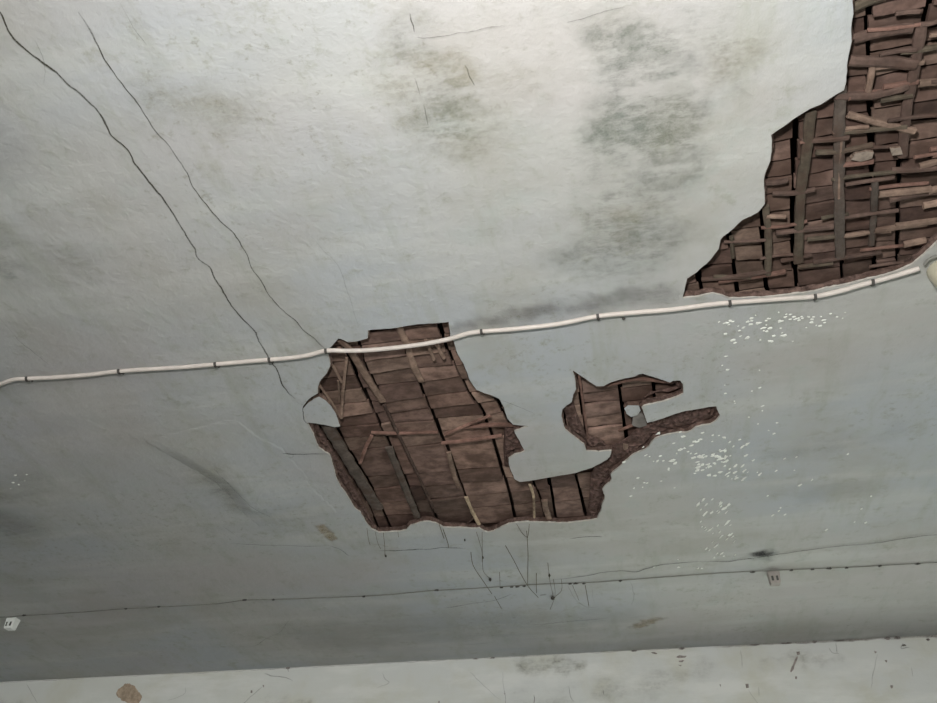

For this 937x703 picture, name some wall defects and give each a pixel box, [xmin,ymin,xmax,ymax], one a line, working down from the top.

crack [0,12,315,392]
damp [590,104,679,144]
spalling [683,0,937,299]
spalling [302,322,762,609]
spalling [116,683,142,703]